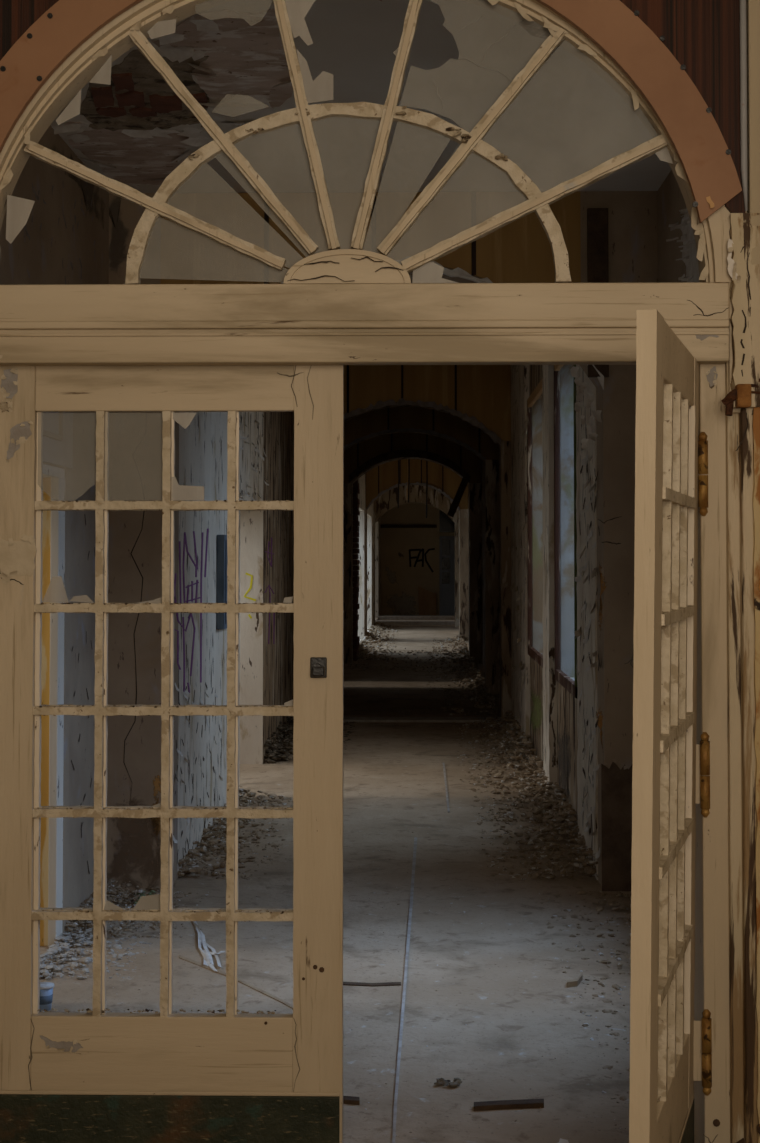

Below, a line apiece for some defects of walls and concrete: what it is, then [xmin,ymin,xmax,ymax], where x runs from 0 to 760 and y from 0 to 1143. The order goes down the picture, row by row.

peeling [52,5,293,190]
peeling [514,2,568,39]
peeling [578,44,597,56]
peeling [629,86,639,111]
crack [123,412,147,805]
flaking render [575,444,633,891]